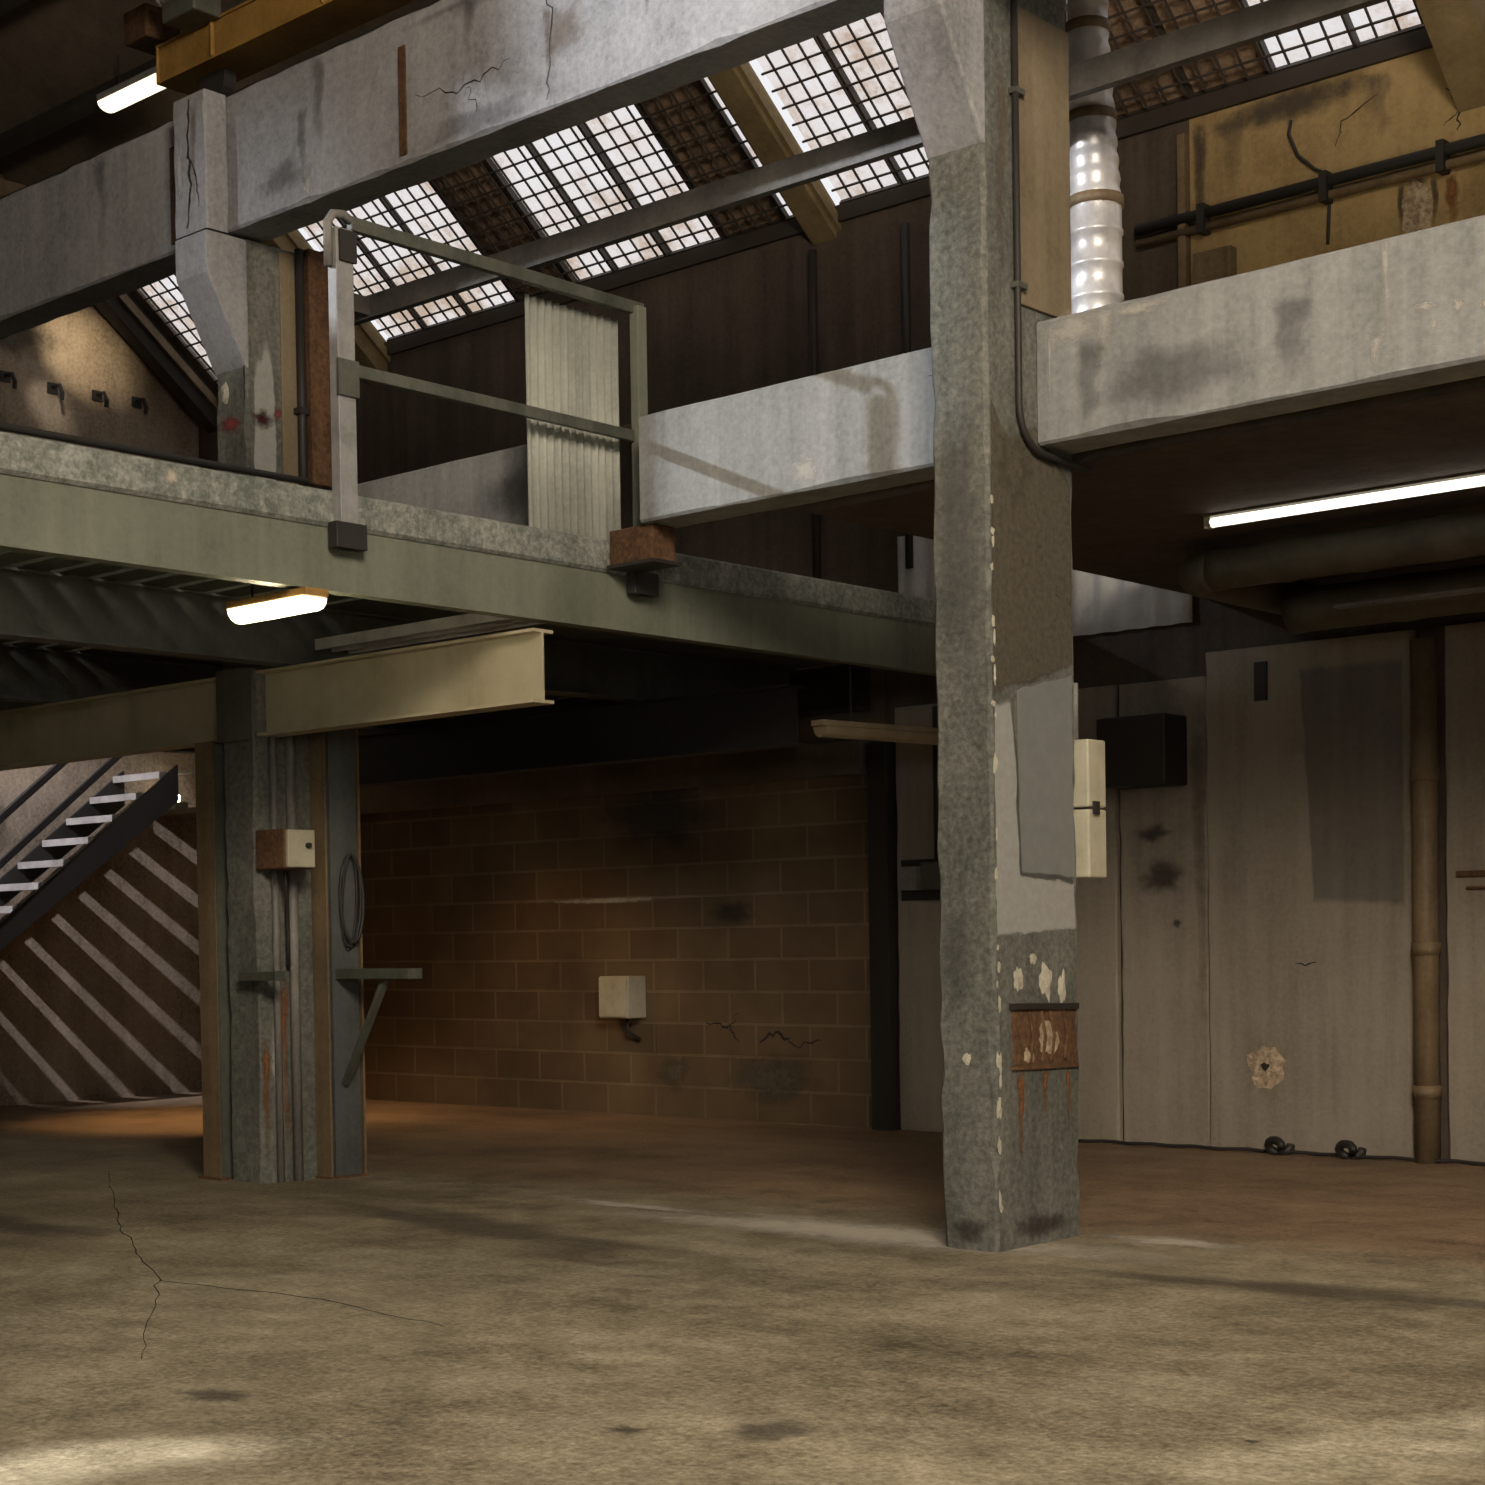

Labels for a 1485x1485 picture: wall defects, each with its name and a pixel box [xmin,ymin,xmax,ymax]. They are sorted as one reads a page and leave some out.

crack [545,0,553,100]
spalling [1398,179,1438,234]
peeling [990,401,1079,1119]
crack [706,1013,821,1048]
spalling [1247,1045,1286,1091]
crack [108,1172,445,1359]